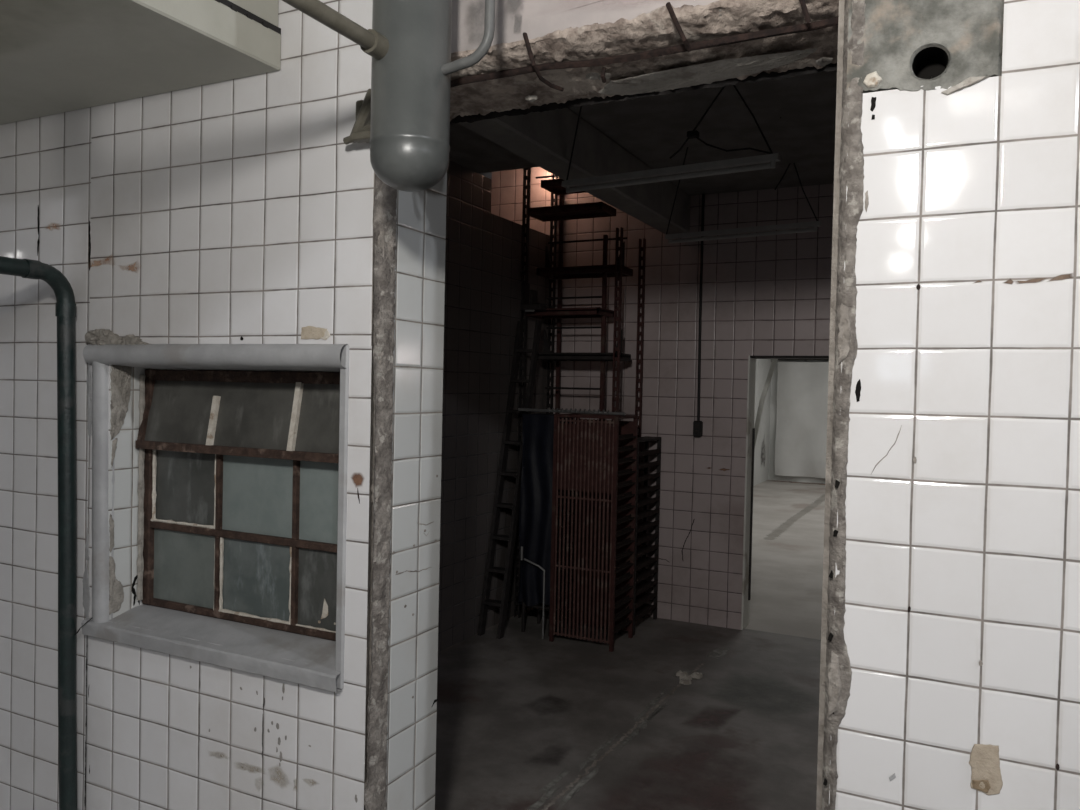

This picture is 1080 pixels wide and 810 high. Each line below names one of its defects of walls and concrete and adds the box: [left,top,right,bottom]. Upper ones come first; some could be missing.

crack [34,206,42,256]
crack [85,221,93,271]
spalling [85,329,149,345]
spalling [110,365,132,468]
spalling [450,0,1004,810]
corrosion [352,474,363,504]
spalling [364,174,398,810]
spalling [109,514,124,615]